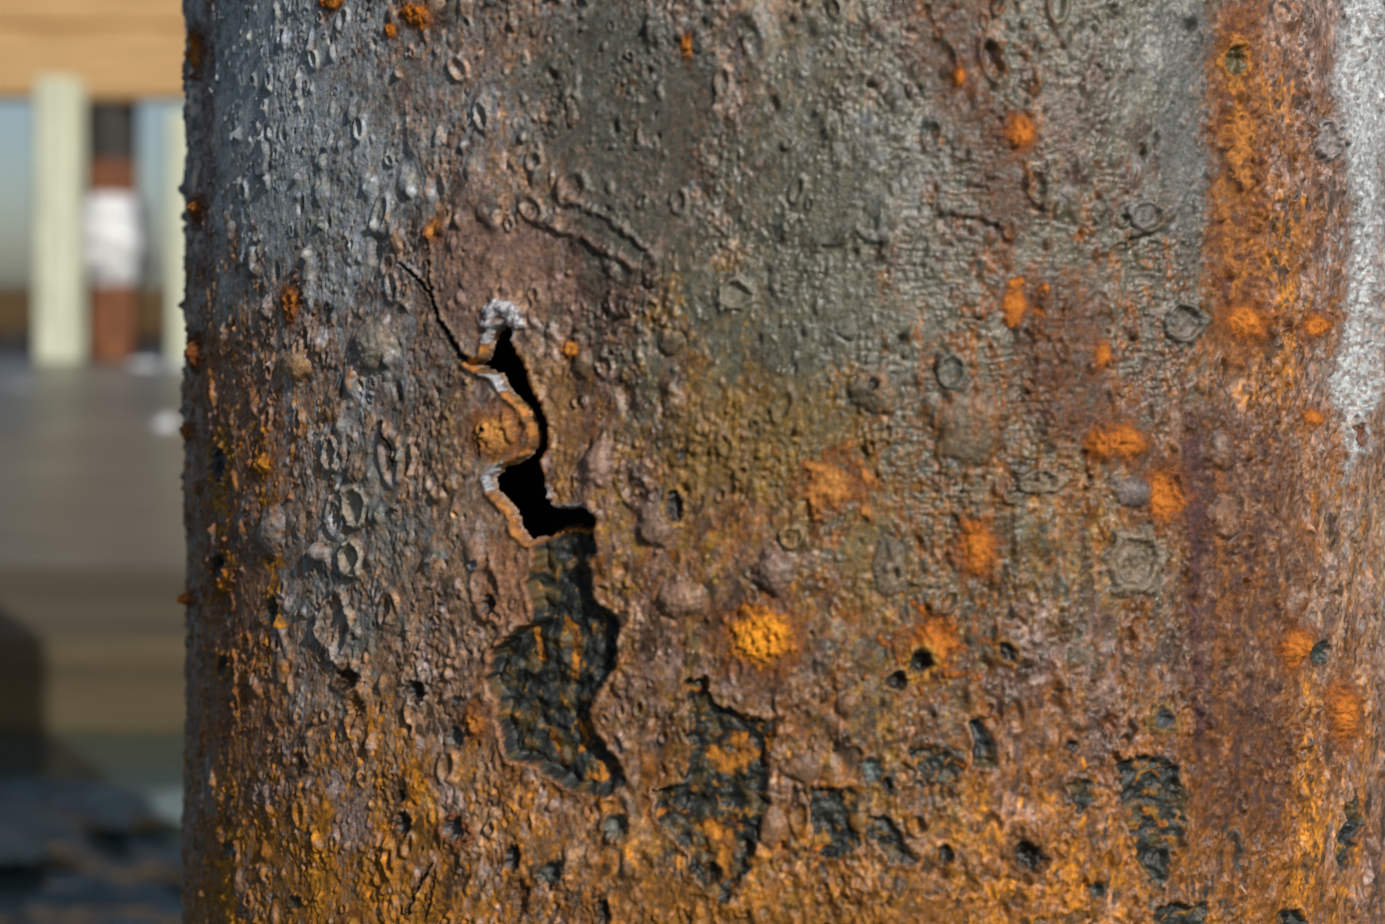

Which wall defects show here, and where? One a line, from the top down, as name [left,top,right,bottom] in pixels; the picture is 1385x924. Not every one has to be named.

rust [1201,5,1334,375]
rust [183,332,206,376]
crack [397,237,480,370]
rust [176,422,282,608]
crack [475,426,483,457]
rust [789,440,887,536]
spalling [484,526,639,846]
rust [718,589,810,679]
rust [864,586,994,705]
rust [1314,670,1366,755]
spalling [650,674,784,904]
rust [192,793,486,924]